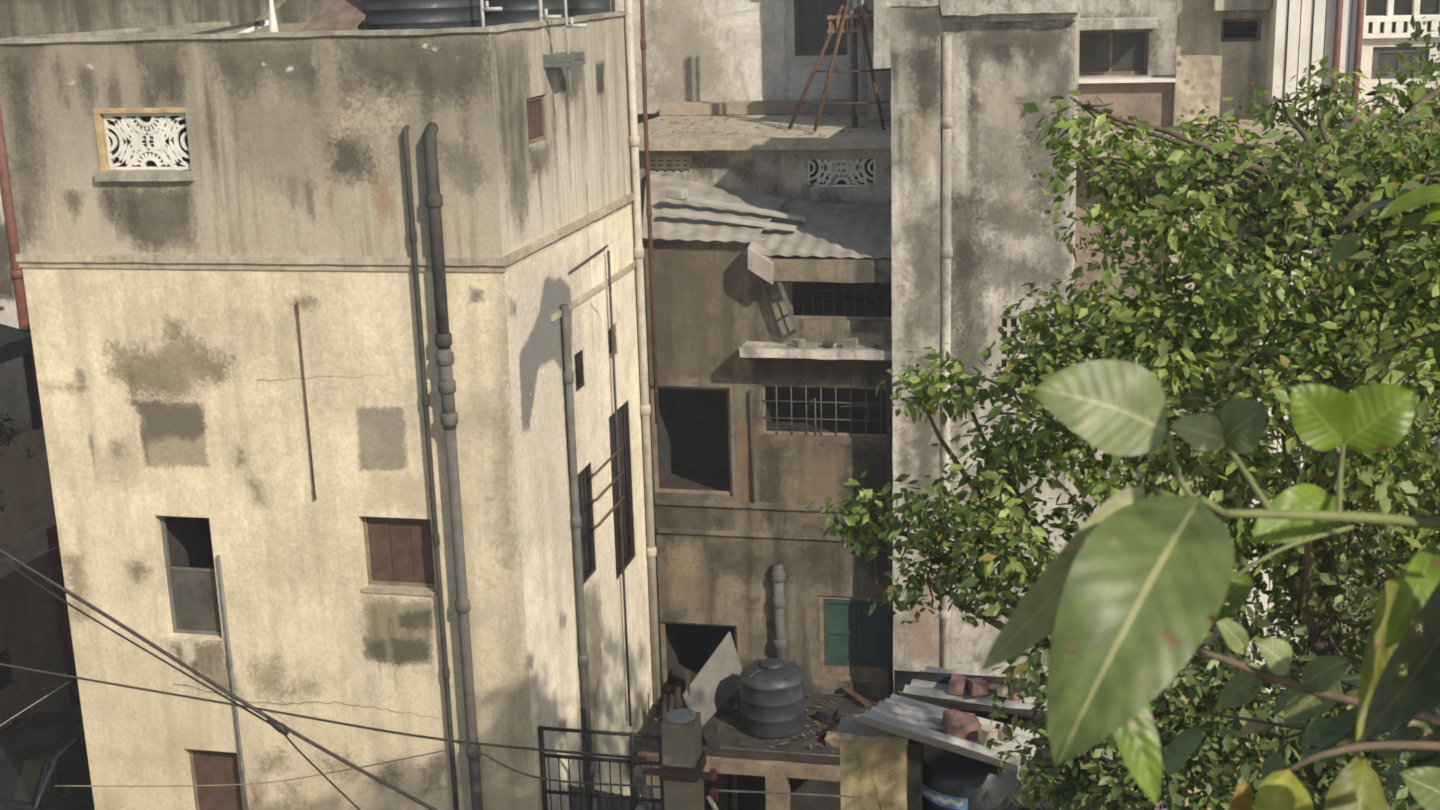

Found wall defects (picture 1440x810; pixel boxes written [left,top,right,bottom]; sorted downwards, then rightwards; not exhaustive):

water stain [327,139,371,183]
water stain [337,36,546,222]
water stain [106,185,190,251]
water stain [840,5,1084,580]
water stain [109,319,236,448]
water stain [753,358,892,382]
water stain [364,597,433,665]